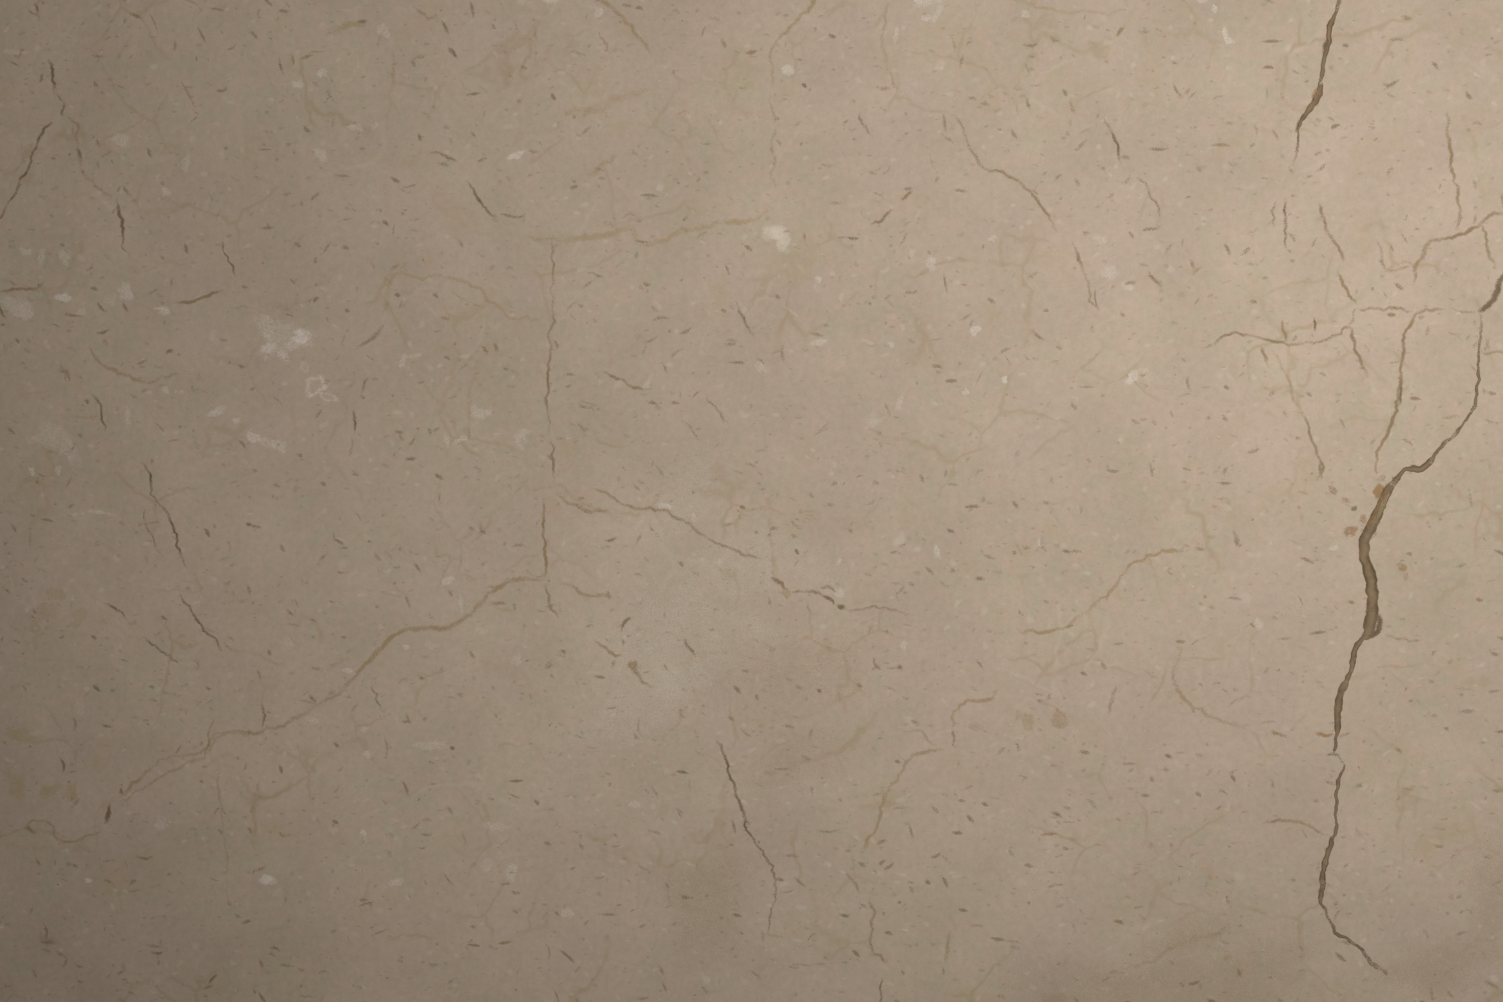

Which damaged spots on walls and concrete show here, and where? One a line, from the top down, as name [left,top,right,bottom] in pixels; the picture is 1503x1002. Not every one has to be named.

crack [1293,0,1342,166]
crack [1206,113,1503,972]
crack [716,737,777,932]